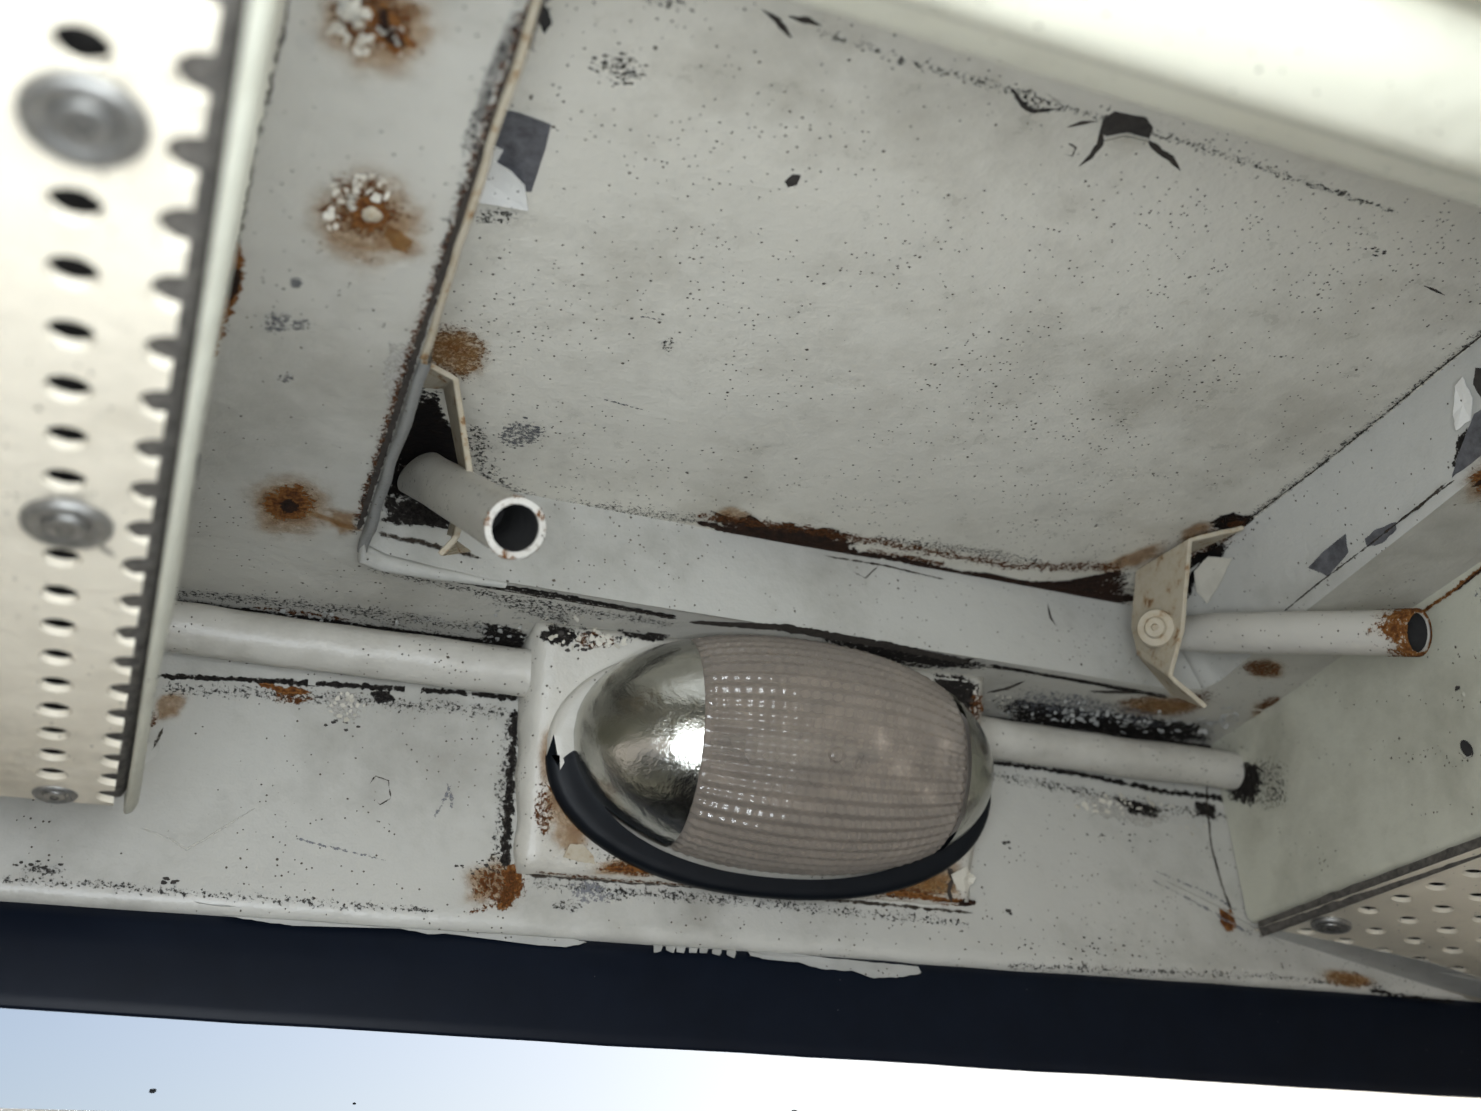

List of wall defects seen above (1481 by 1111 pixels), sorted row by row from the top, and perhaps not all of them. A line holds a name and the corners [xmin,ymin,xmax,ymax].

corrosion [325,0,424,66]
corrosion [319,170,415,255]
corrosion [428,324,488,382]
corrosion [258,483,360,532]
corrosion [1468,471,1481,496]
corrosion [694,509,1156,605]
corrosion [486,593,573,626]
corrosion [1368,567,1481,657]
corrosion [454,859,527,914]